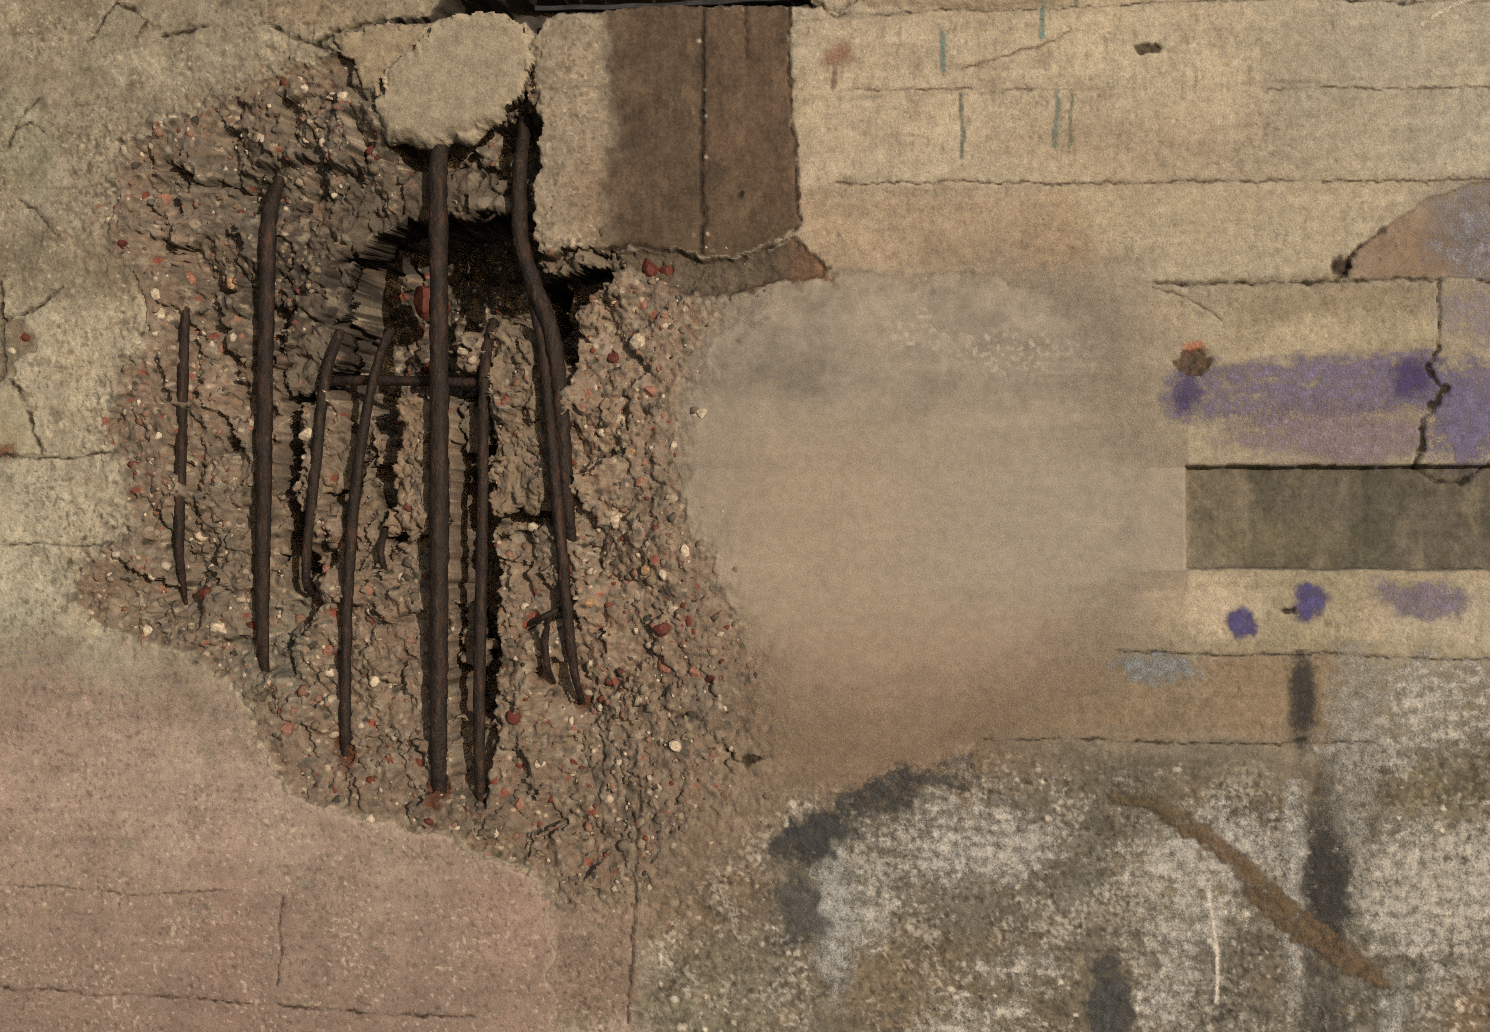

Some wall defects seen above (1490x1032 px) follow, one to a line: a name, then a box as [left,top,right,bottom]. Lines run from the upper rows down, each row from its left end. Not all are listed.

crack [91,2,206,40]
crack [0,283,110,460]
rust [174,306,190,605]
rust [301,144,498,808]
spalling [73,21,831,912]
rust [511,114,594,709]
crack [1152,232,1489,485]
damp [769,639,1490,1032]
rust [1108,790,1391,989]